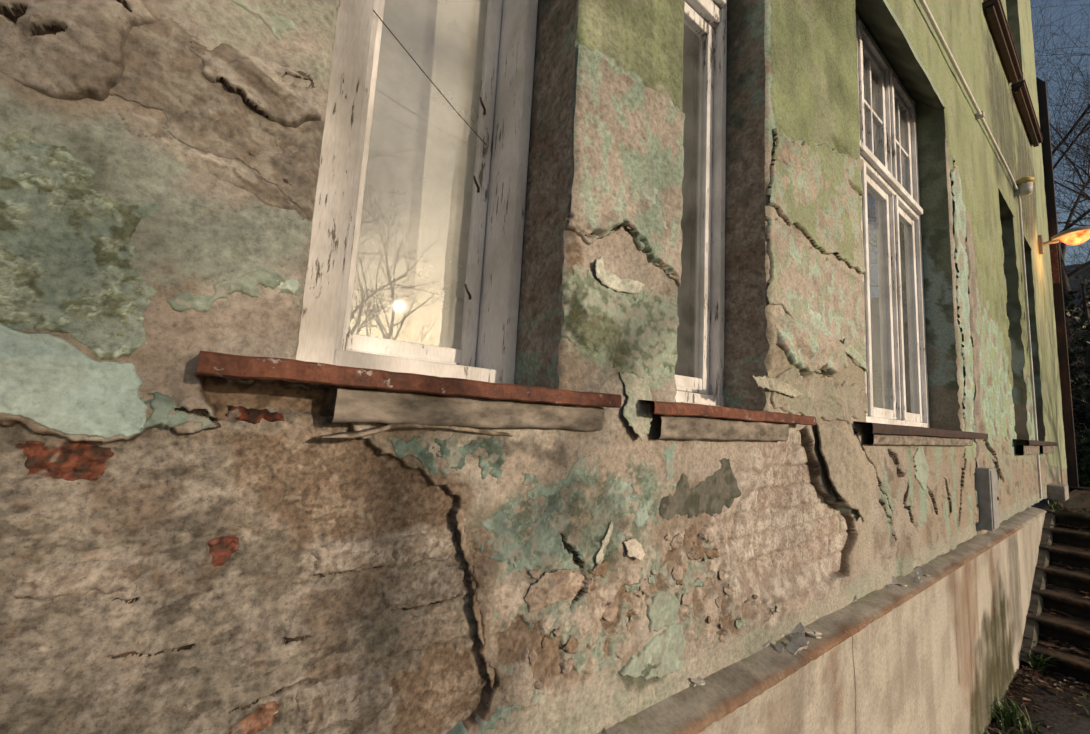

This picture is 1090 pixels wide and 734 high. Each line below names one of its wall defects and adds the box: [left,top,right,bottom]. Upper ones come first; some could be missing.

flaking render [0,128,871,734]
peeling [565,44,685,287]
peeling [913,445,929,490]
peeling [950,156,974,432]